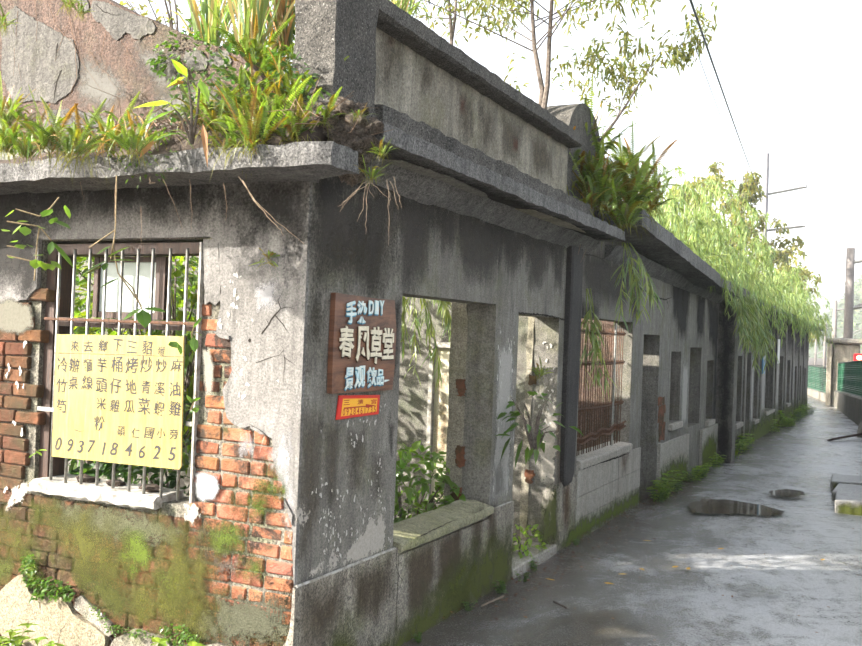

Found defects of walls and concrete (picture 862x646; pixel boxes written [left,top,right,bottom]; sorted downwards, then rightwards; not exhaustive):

flaking render [1,5,131,143]
flaking render [78,0,233,124]
leakage [371,148,537,211]
leakage [0,176,564,342]
spalling [0,299,33,348]
crack [256,297,295,379]
spalling [3,482,29,512]
spalling [183,272,311,646]
peeling [309,452,394,578]
leakage [357,563,390,615]
leakage [408,532,460,608]
leakage [473,510,495,560]